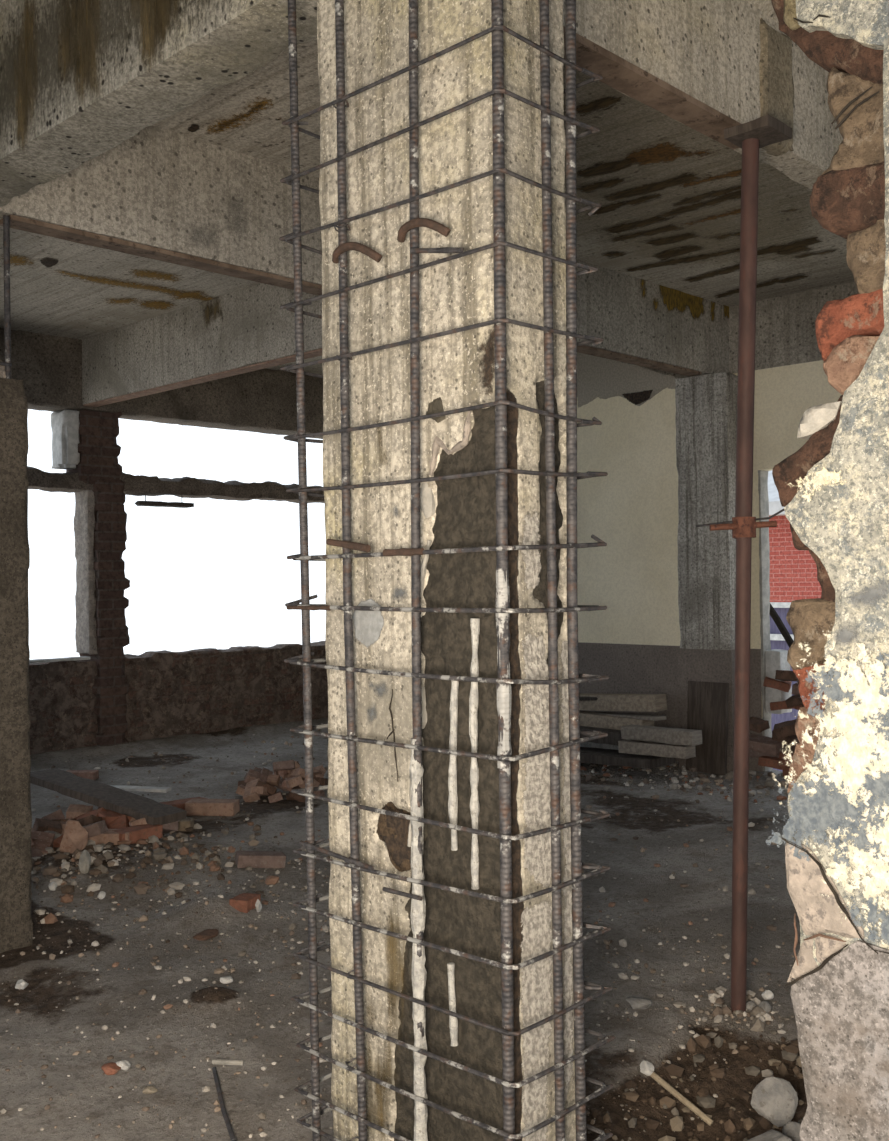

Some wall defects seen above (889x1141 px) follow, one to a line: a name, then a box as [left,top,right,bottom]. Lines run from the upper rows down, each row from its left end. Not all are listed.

water stain [0,0,225,146]
corrosion [206,96,281,134]
corrosion [576,97,621,116]
corrosion [56,270,212,310]
corrosion [576,142,741,283]
corrosion [757,274,808,288]
corrosion [757,237,840,258]
spalling [771,0,886,507]
peeling [577,352,677,407]
spalling [533,381,564,637]
spalling [376,326,524,1141]
crack [781,837,889,987]